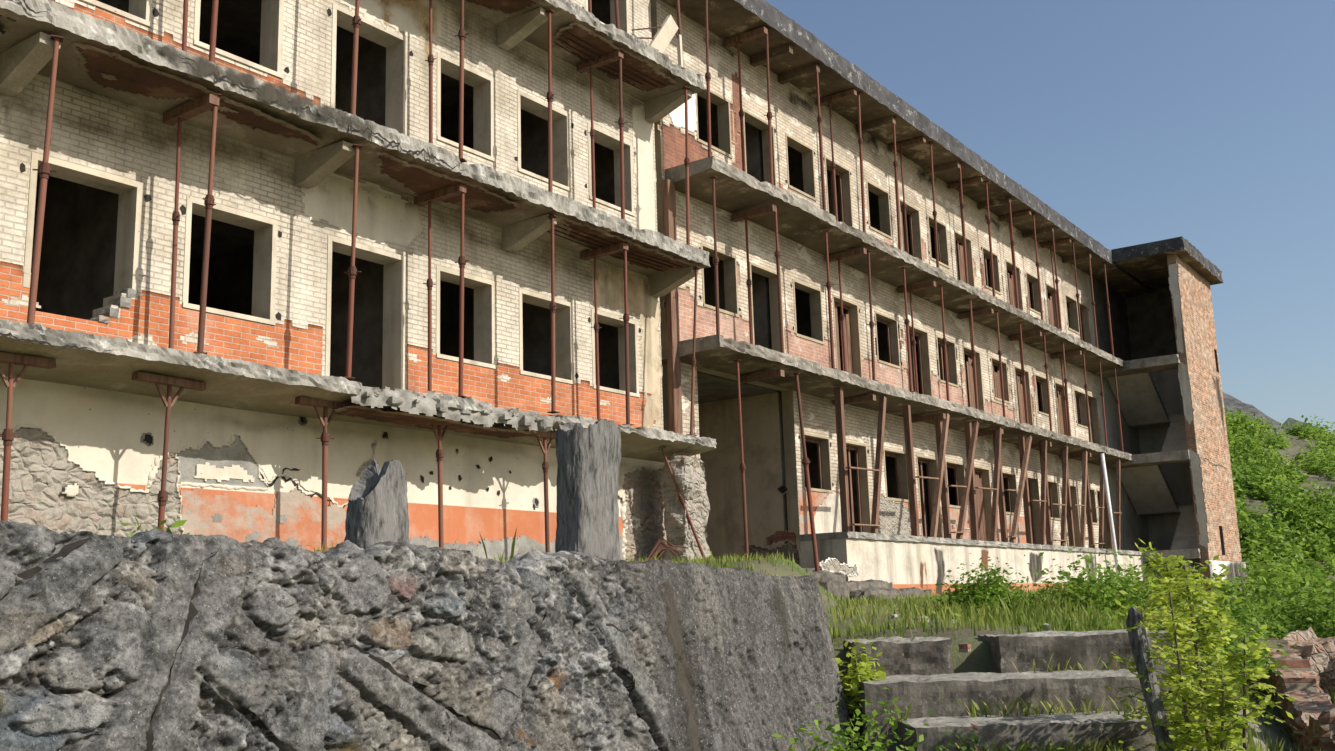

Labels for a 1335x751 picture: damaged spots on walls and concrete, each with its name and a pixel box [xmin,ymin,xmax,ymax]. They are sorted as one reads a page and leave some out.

flaking render [0,260,323,375]
flaking render [330,343,656,439]
flaking render [0,424,346,550]
crack [259,468,348,509]
peeling [409,535,555,563]
flaking render [618,465,667,562]